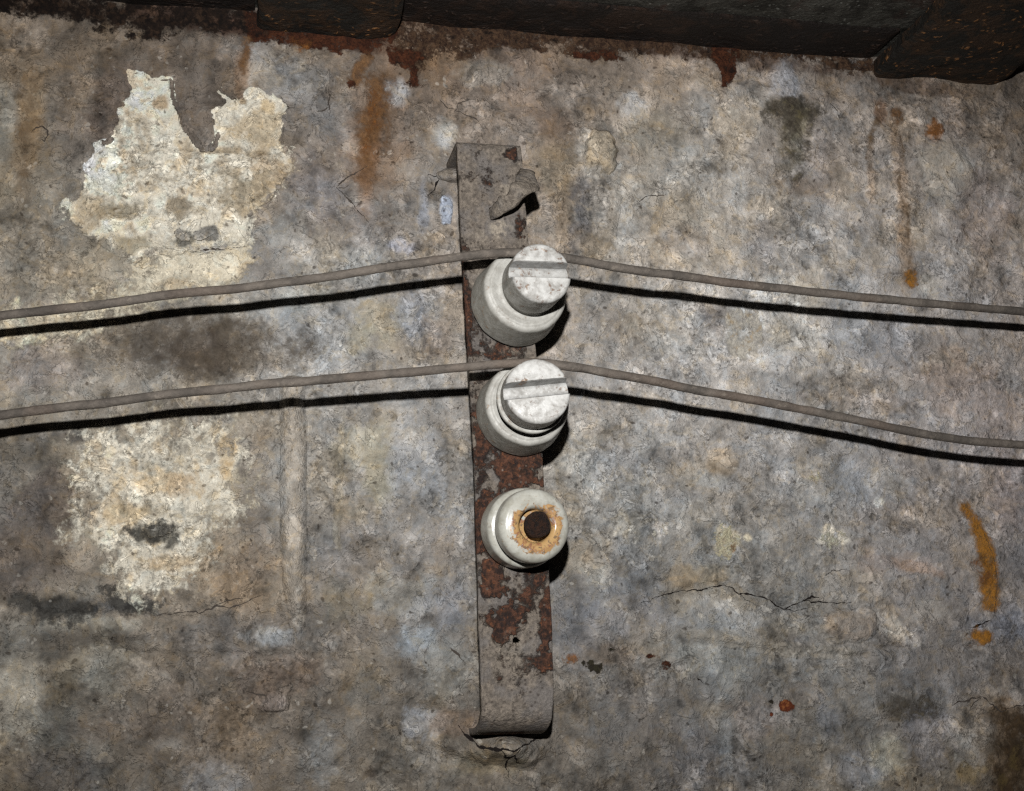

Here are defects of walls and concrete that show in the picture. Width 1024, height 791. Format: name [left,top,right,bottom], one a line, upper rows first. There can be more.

rust [239,11,875,179]
rust [926,117,944,139]
flaking render [0,69,299,350]
rust [961,503,999,611]
crack [641,569,851,612]
rust [972,629,991,645]
rust [769,699,795,716]
crack [458,725,546,777]